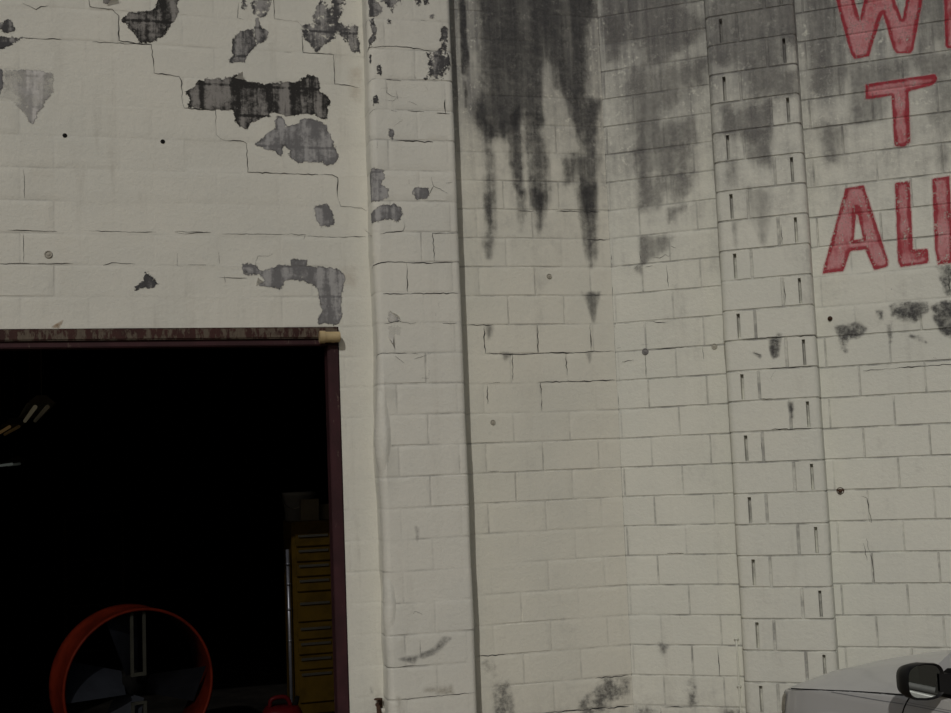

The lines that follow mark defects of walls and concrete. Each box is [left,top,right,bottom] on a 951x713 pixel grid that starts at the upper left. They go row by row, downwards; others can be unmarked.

peeling [0,19,22,49]
peeling [0,69,51,124]
peeling [121,0,179,44]
peeling [185,0,339,166]
peeling [302,0,401,75]
peeling [424,26,450,80]
damp [459,0,469,73]
damp [477,0,600,256]
damp [640,237,665,264]
peeling [241,258,345,326]